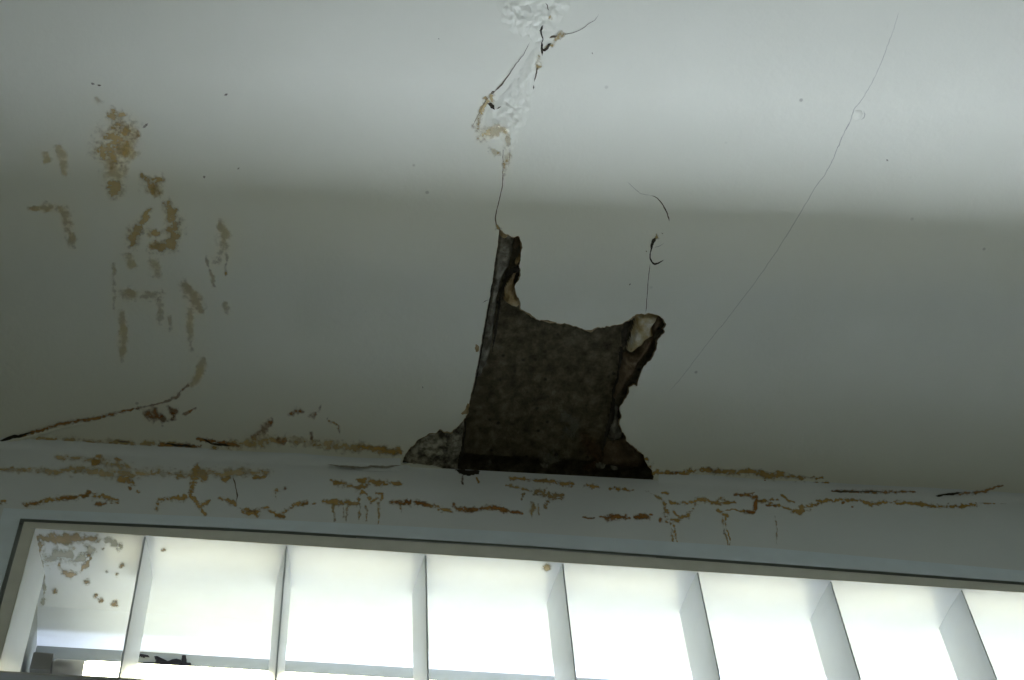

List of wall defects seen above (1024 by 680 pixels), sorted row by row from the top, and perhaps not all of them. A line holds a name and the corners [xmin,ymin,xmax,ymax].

water stain [97,110,140,168]
water stain [128,173,180,252]
crack [495,143,511,230]
crack [674,16,898,386]
crack [630,184,669,309]
flaking render [328,230,666,480]
crack [0,385,189,443]
water stain [330,478,402,490]
water stain [509,477,633,491]
water stain [661,492,736,505]
water stain [644,458,829,483]